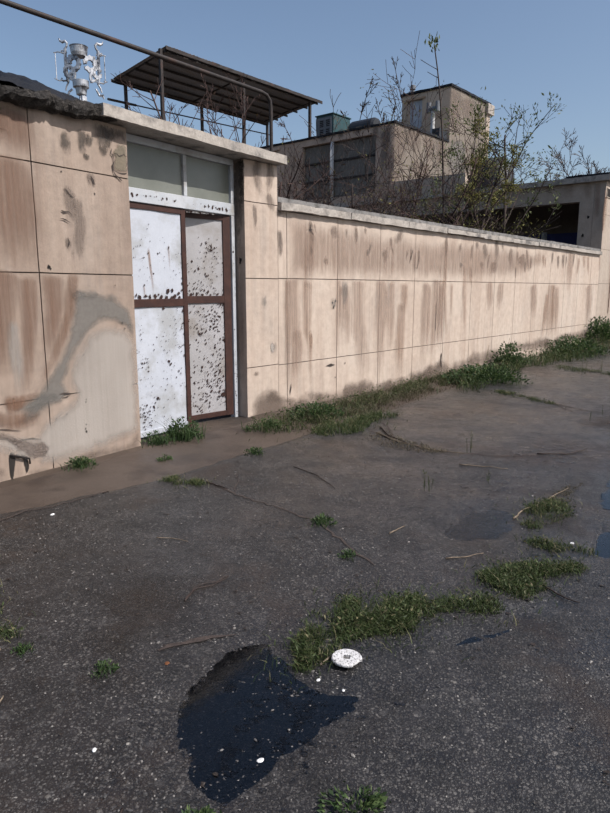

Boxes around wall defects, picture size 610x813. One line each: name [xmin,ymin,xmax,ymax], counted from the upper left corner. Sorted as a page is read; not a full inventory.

water stain [0,292,136,479]